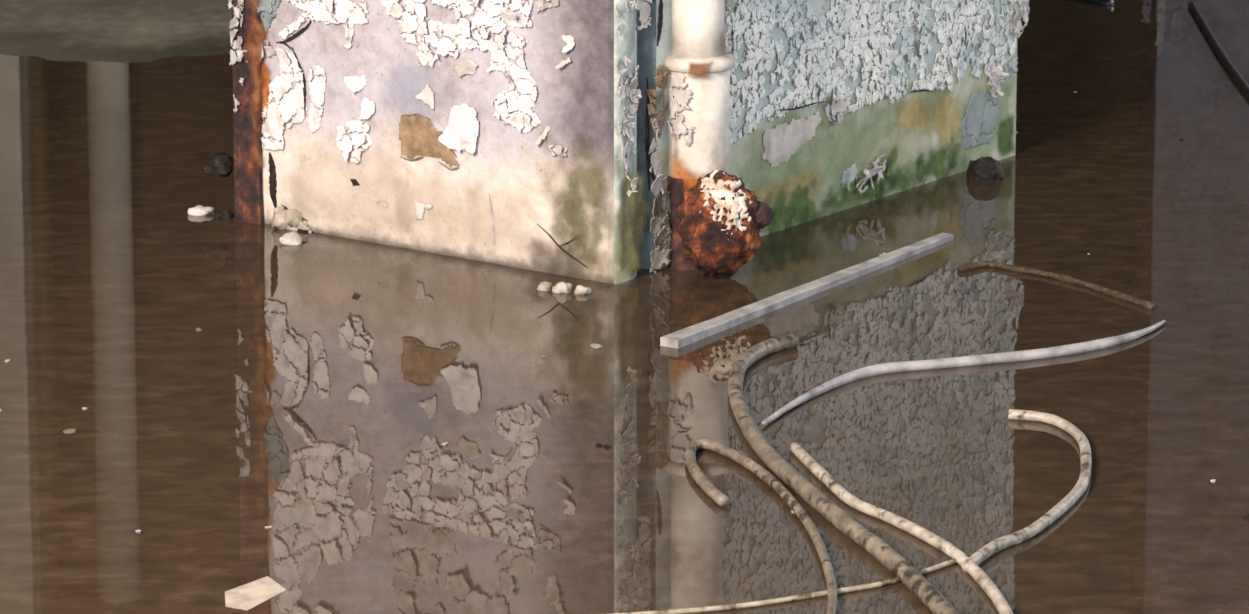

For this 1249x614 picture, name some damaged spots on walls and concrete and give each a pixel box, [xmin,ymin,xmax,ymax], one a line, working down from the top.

rust [247,143,262,173]
rust [246,0,270,126]
peeling [335,75,375,186]
peeling [228,0,568,157]
flaking render [399,84,479,170]
peeling [555,35,575,69]
rust [672,164,698,188]
peeling [725,0,1030,167]
leakage [881,95,960,154]